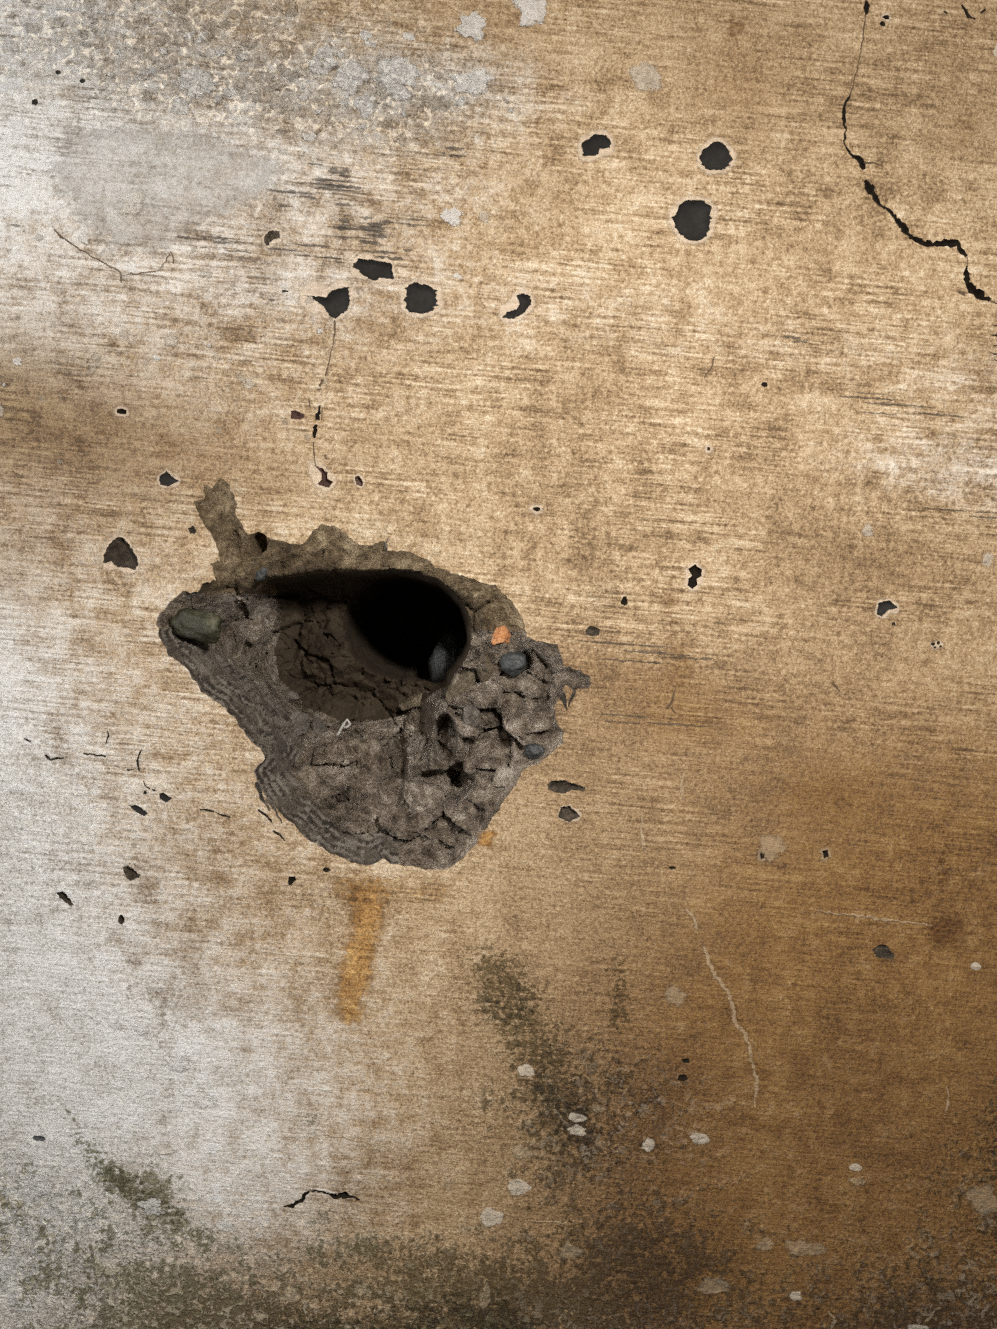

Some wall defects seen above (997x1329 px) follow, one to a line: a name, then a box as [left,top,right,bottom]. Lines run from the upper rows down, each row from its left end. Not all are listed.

peeling [7,0,65,33]
peeling [78,0,345,134]
peeling [333,25,465,147]
crack [841,0,997,361]
peeling [157,469,181,488]
spalling [156,478,591,872]
rust [326,871,460,1026]
leakage [137,1197,165,1216]
crack [283,1188,360,1208]